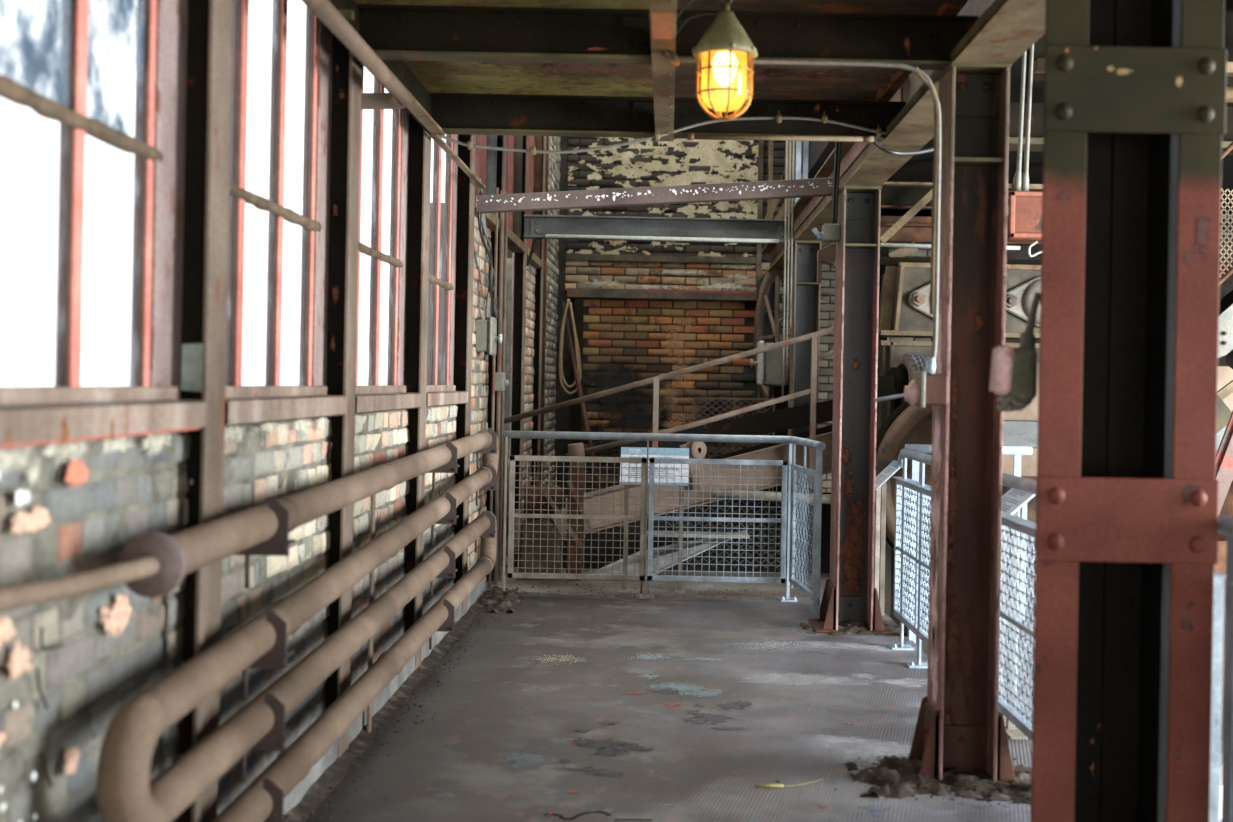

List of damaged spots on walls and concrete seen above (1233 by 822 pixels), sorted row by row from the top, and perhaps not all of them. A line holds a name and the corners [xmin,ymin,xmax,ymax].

peeling [568,137,758,190]
peeling [648,200,757,219]
peeling [567,240,753,257]
spalling [65,459,89,489]
spalling [12,506,52,535]
corrosion [839,447,866,596]
corrosion [945,356,975,704]
spalling [101,594,134,637]
spalling [0,617,32,680]